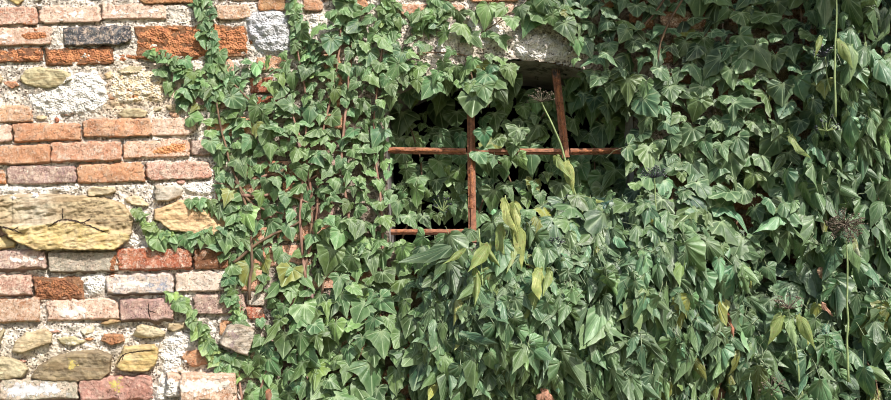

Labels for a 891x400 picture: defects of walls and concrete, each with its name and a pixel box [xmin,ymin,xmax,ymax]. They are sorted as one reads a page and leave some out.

rust [554,78,618,154]
rust [390,148,475,209]
crack [48,208,110,234]